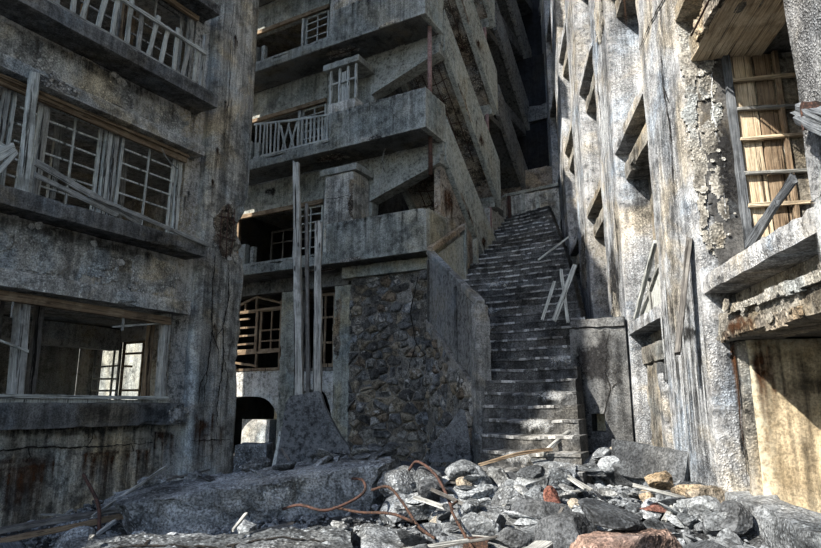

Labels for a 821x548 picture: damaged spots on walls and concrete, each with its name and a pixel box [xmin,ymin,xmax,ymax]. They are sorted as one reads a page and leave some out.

flaking render [677,0,744,267]
crack [198,257,230,453]
corrosion [82,431,174,479]